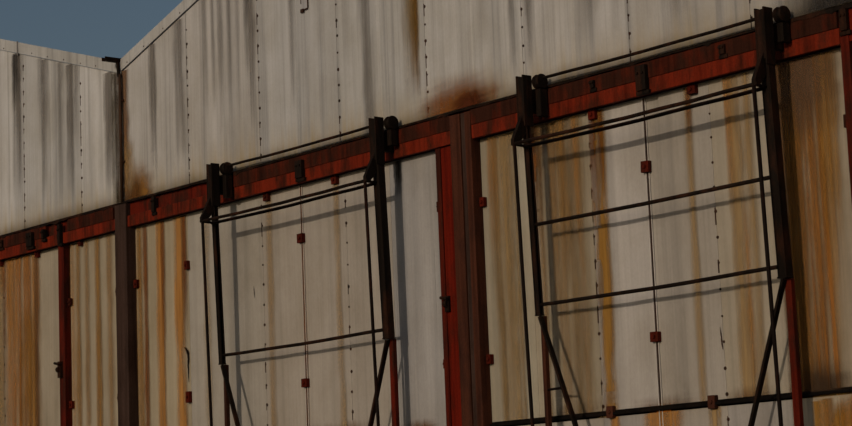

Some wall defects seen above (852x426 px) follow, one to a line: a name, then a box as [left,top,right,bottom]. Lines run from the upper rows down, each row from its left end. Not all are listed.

leakage [13,53,21,158]
rust [114,70,149,202]
rust [406,0,417,48]
rust [427,85,495,116]
rust [6,254,38,426]
rust [137,221,166,426]
rust [174,215,187,426]
rust [590,109,619,426]
rust [775,51,852,426]